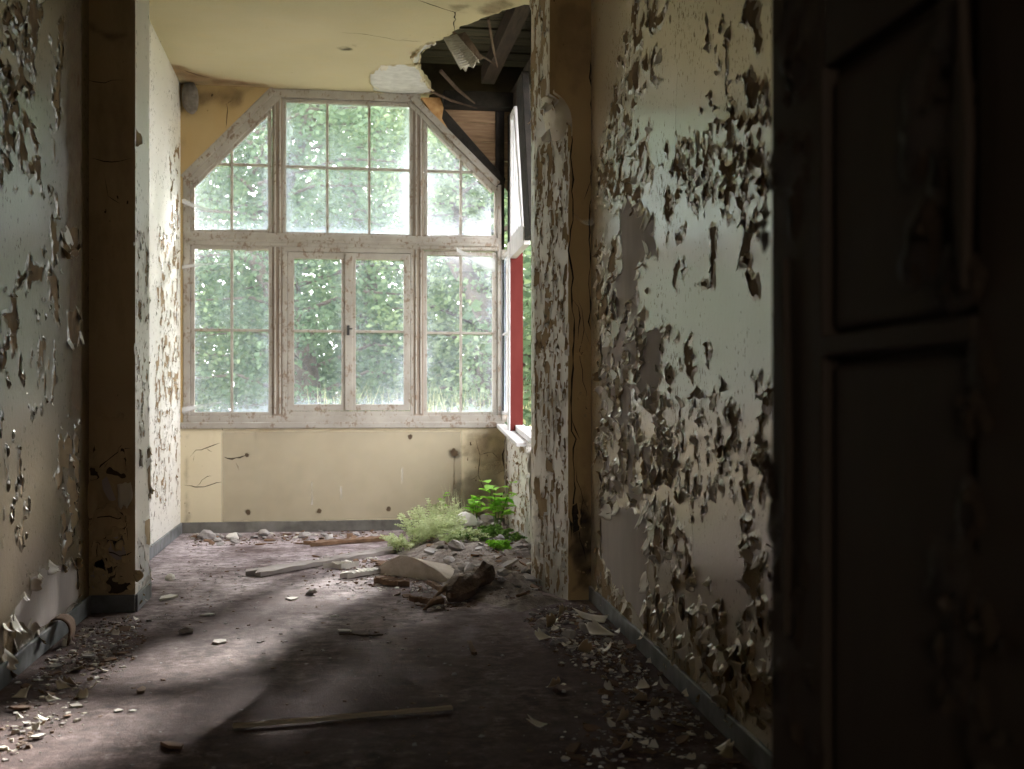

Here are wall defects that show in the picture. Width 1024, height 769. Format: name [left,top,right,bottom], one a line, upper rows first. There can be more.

peeling [0,0,85,553]
flaking render [1,135,181,714]
peeling [135,127,143,150]
crack [187,443,245,488]
flaking render [368,42,447,127]
peeling [504,0,582,596]
crack [568,138,591,537]
flaking render [572,0,825,769]